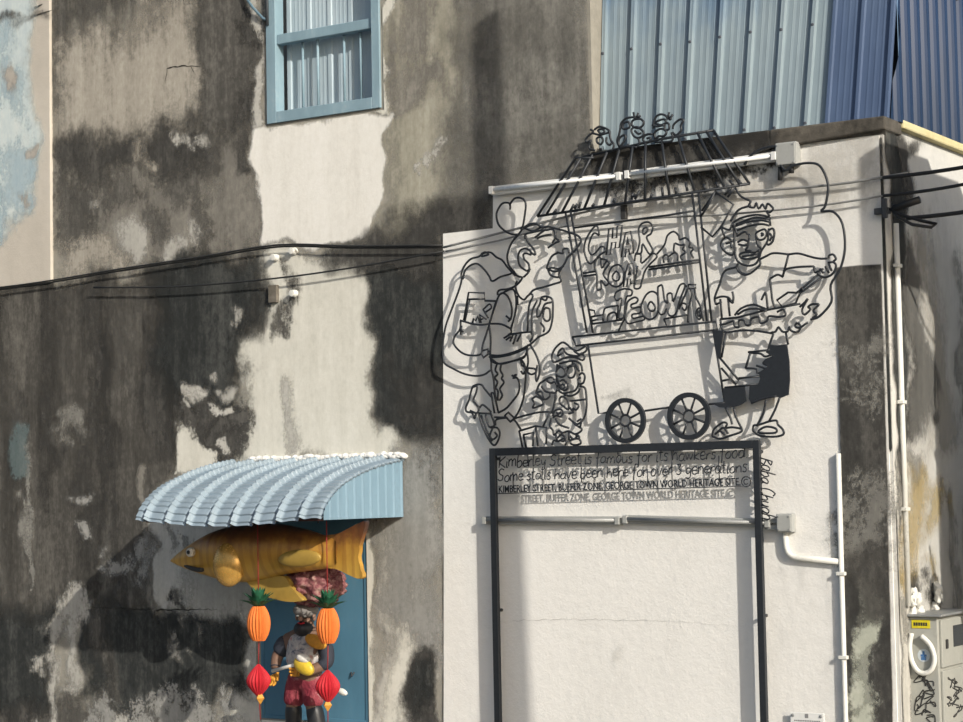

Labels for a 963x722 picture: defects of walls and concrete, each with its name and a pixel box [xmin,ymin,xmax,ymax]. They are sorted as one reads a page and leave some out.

peeling [0,0,44,242]
leakage [0,0,269,722]
leakage [879,131,963,535]
leakage [911,567,942,606]